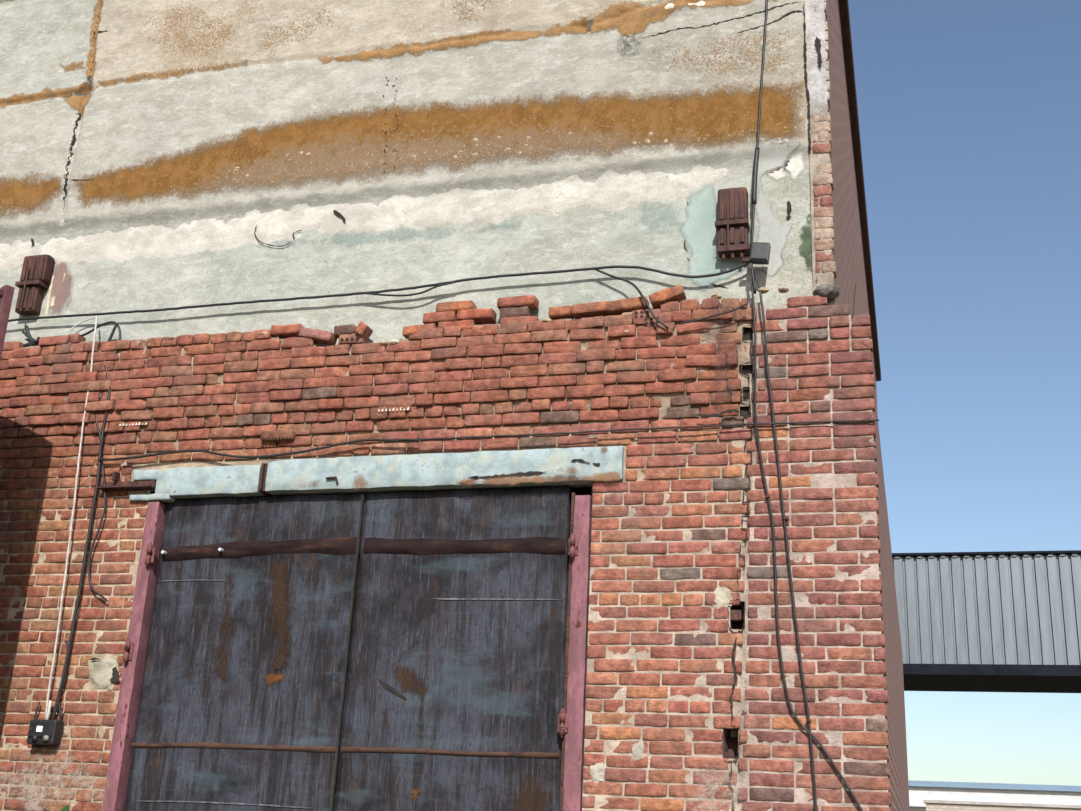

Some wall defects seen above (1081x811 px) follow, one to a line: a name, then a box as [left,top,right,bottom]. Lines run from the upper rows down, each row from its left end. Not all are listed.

damp [319,0,752,64]
damp [0,175,62,217]
crack [63,105,92,211]
damp [76,84,803,206]
crack [642,1,822,200]
flaking render [755,138,805,276]
corrosion [460,468,620,485]
spalling [88,657,120,690]
corrosion [265,561,292,685]
corrosion [395,666,428,698]